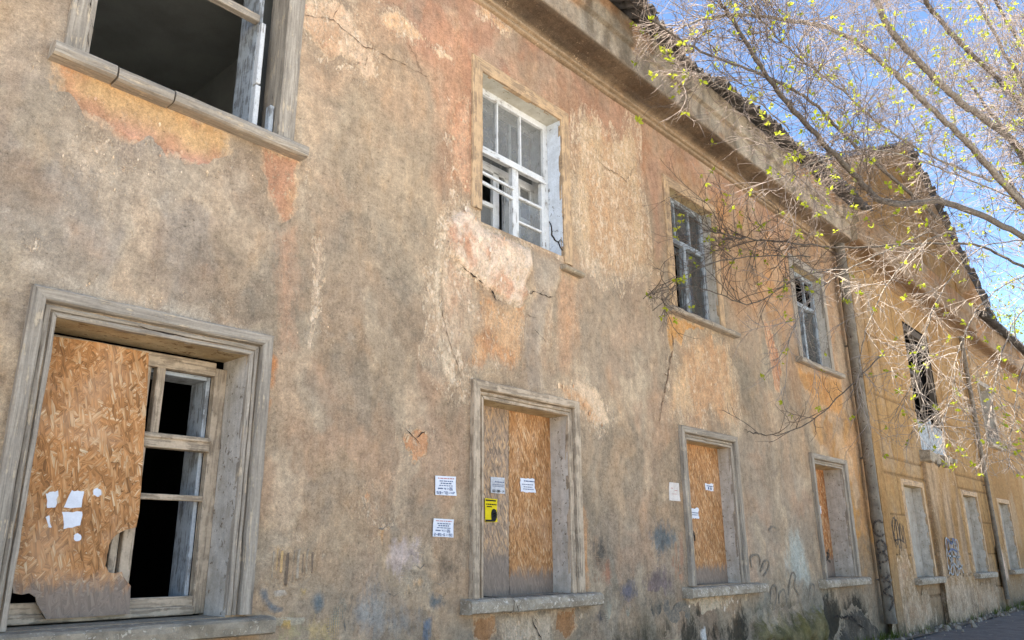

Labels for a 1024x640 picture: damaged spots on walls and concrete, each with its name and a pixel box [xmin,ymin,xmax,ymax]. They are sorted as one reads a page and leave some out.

crack [307,3,429,77]
peeling [0,39,307,367]
peeling [415,103,653,408]
peeling [297,310,366,363]
crack [659,326,674,423]